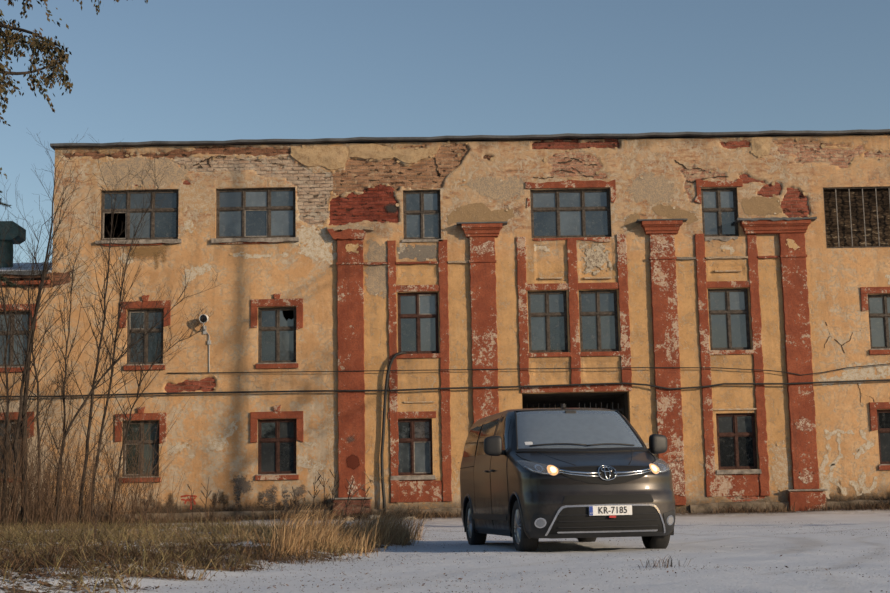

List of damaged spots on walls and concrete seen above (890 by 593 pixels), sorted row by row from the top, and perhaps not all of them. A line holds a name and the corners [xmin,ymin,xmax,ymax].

flaking render [63,141,469,265]